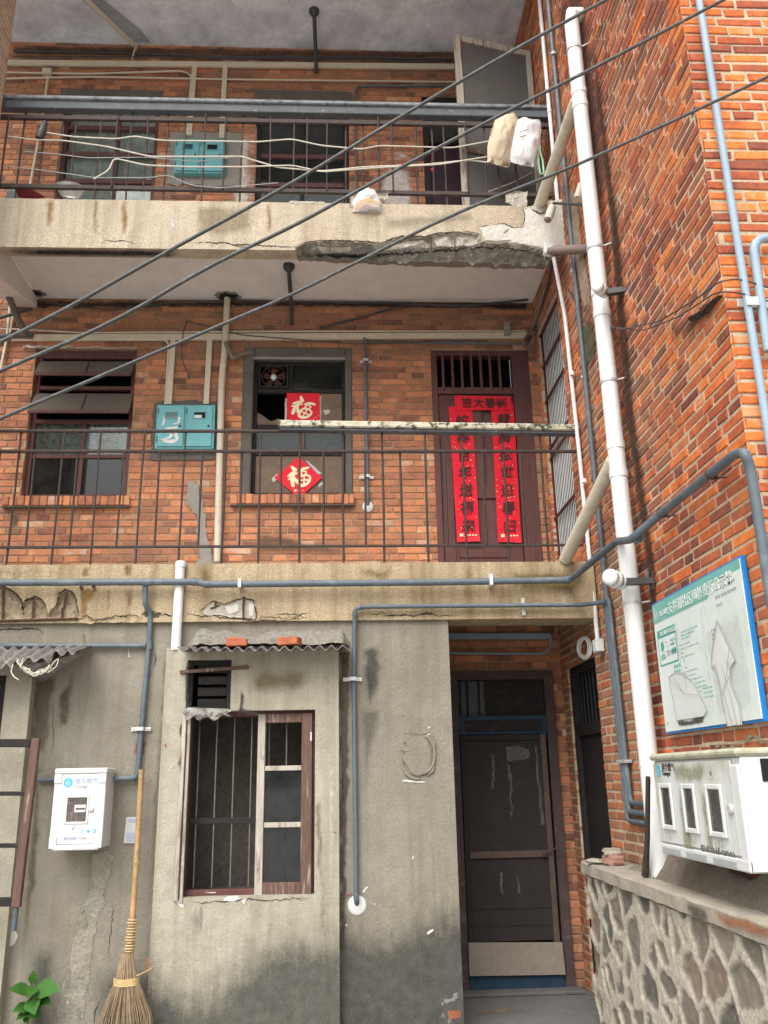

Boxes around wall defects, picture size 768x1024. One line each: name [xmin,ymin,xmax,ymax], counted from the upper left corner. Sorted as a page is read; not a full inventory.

crack [190,241,294,249]
spalling [297,224,549,269]
spalling [0,586,161,624]
spalling [200,597,257,620]
damp [140,649,464,1024]